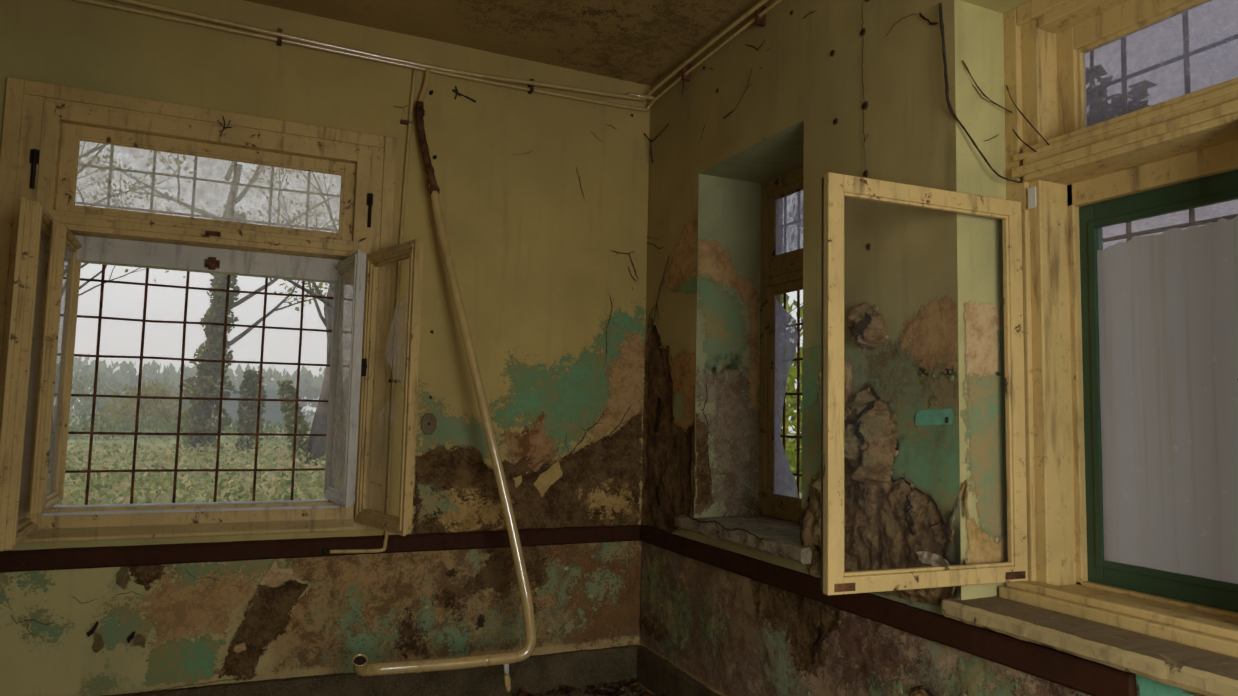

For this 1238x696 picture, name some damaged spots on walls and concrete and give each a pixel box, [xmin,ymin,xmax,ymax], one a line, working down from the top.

crack [605,236,669,363]
peeling [662,213,760,410]
spalling [408,298,714,535]
spalling [844,294,1006,572]
spalling [0,559,310,687]
spalling [459,541,633,612]
spalling [750,579,850,680]
spalling [799,464,821,577]
spalling [872,586,957,606]
peeling [1135,674,1206,696]